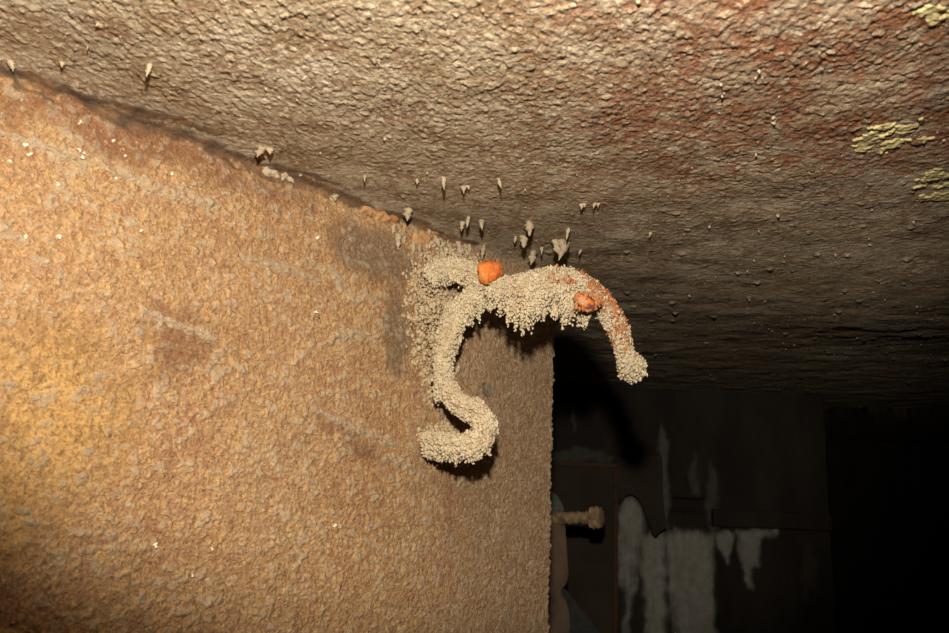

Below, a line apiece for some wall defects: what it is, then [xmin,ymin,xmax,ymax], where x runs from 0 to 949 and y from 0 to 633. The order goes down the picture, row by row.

leakage [336,225,648,467]
rust [547,264,637,358]
efflorescence [618,499,778,633]